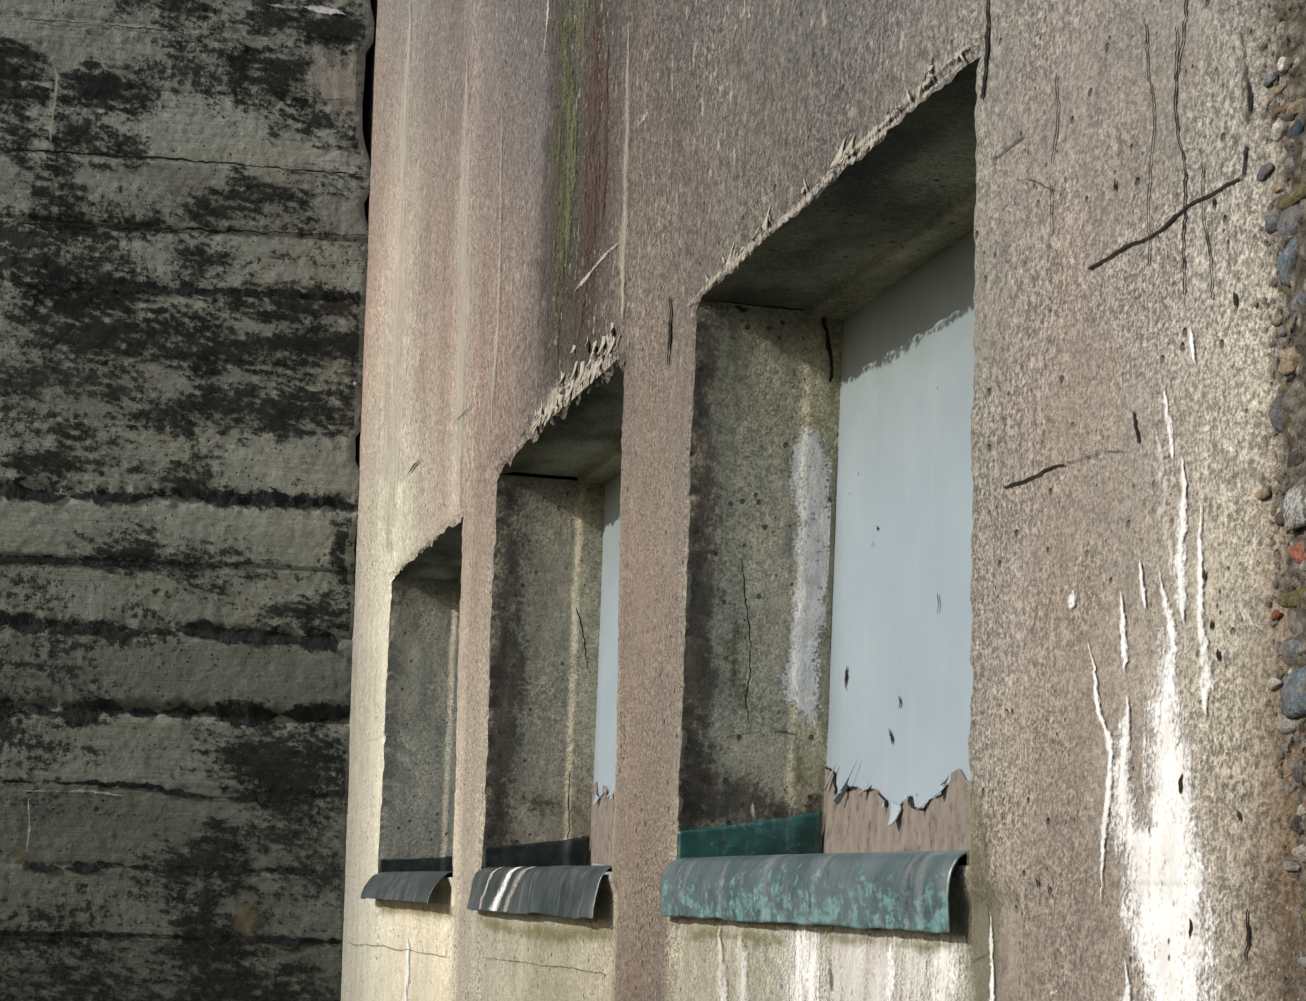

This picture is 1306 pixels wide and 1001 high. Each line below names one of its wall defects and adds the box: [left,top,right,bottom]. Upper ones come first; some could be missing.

water stain [0,708,347,1001]
water stain [0,0,366,506]
water stain [250,517,352,651]
spalling [497,323,624,464]
crack [727,560,795,737]
water stain [777,424,832,766]
water stain [691,834,1003,1001]
peeling [822,759,972,866]
crack [1003,450,1122,488]
water stain [1087,386,1221,1001]
crack [1087,0,1247,299]
spalling [1233,0,1306,1001]